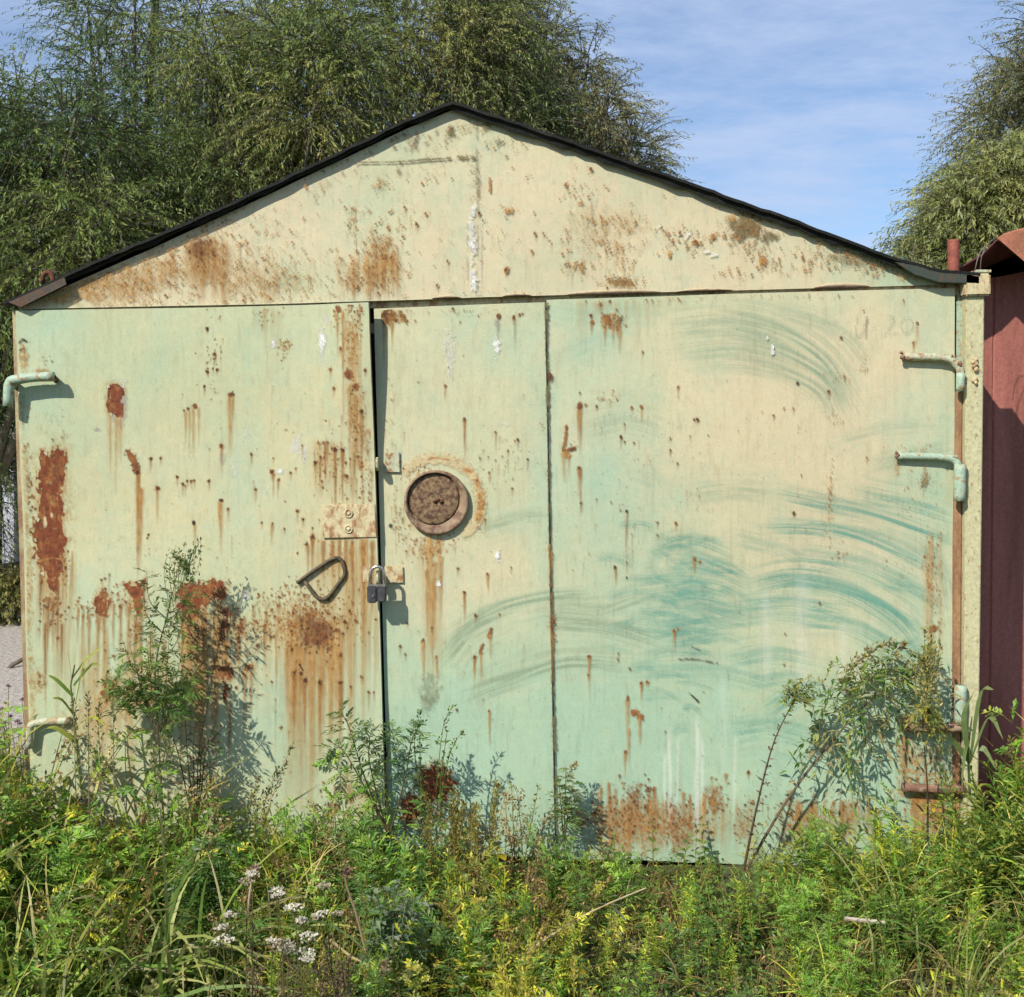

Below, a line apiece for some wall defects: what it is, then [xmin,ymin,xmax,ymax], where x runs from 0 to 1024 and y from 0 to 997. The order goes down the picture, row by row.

corrosion [48,221,247,305]
corrosion [314,199,416,504]
corrosion [238,509,377,730]
corrosion [389,452,492,676]
corrosion [624,695,644,761]